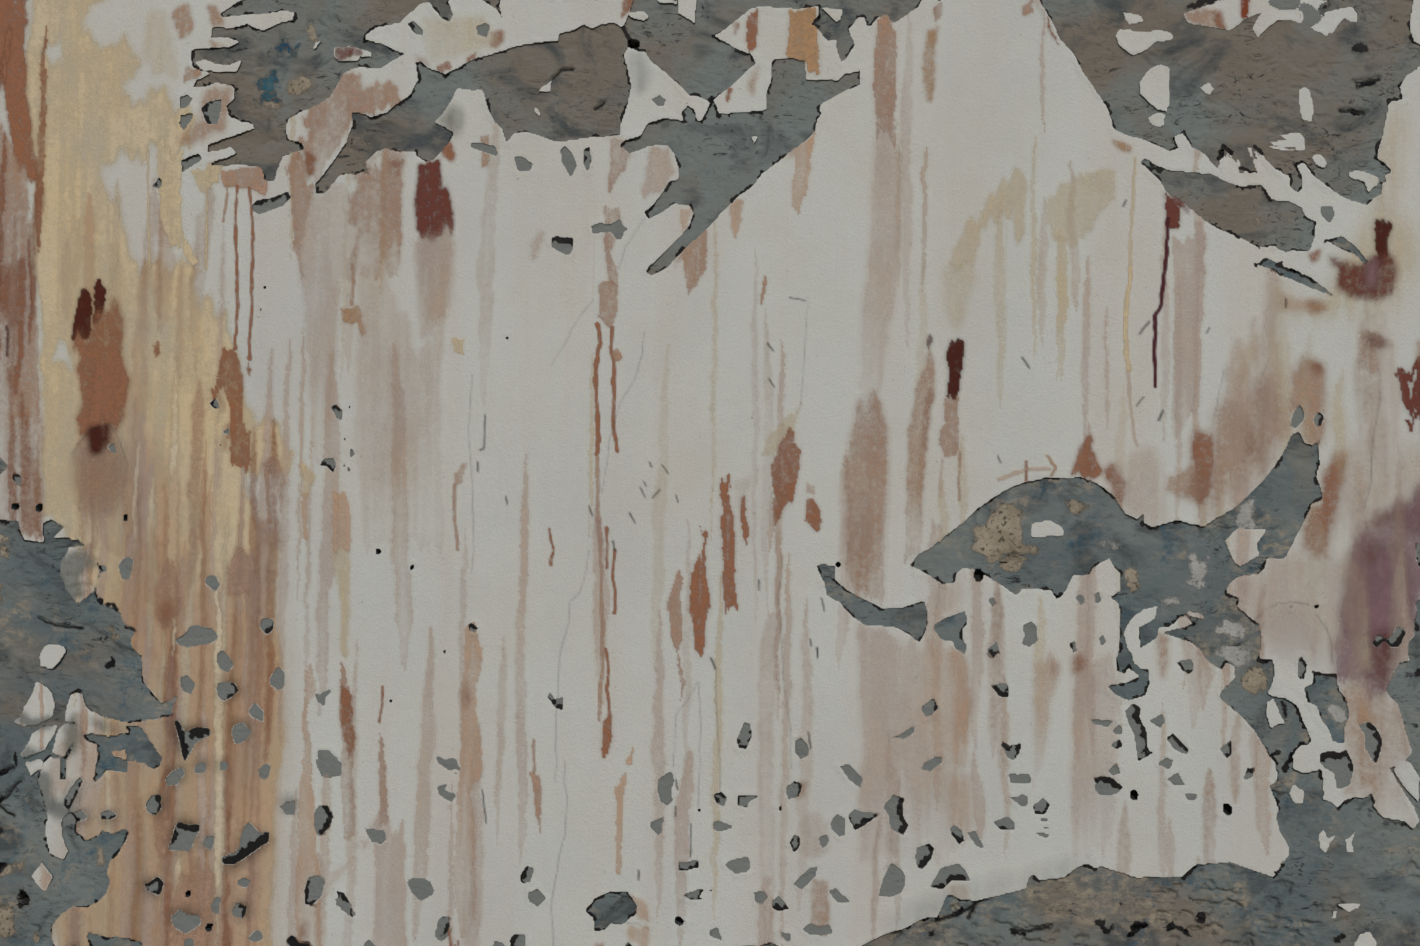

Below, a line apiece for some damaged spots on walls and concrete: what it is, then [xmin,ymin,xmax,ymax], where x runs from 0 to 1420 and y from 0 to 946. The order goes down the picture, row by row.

rust [0,0,48,414]
rust [350,142,455,306]
spalling [179,0,940,275]
spalling [1040,0,1420,299]
rust [71,279,129,515]
spalling [0,519,228,946]
rust [593,232,622,758]
rust [667,474,749,701]
spalling [817,564,967,654]
rust [908,337,964,498]
spalling [862,405,1420,946]
spalling [586,892,637,931]